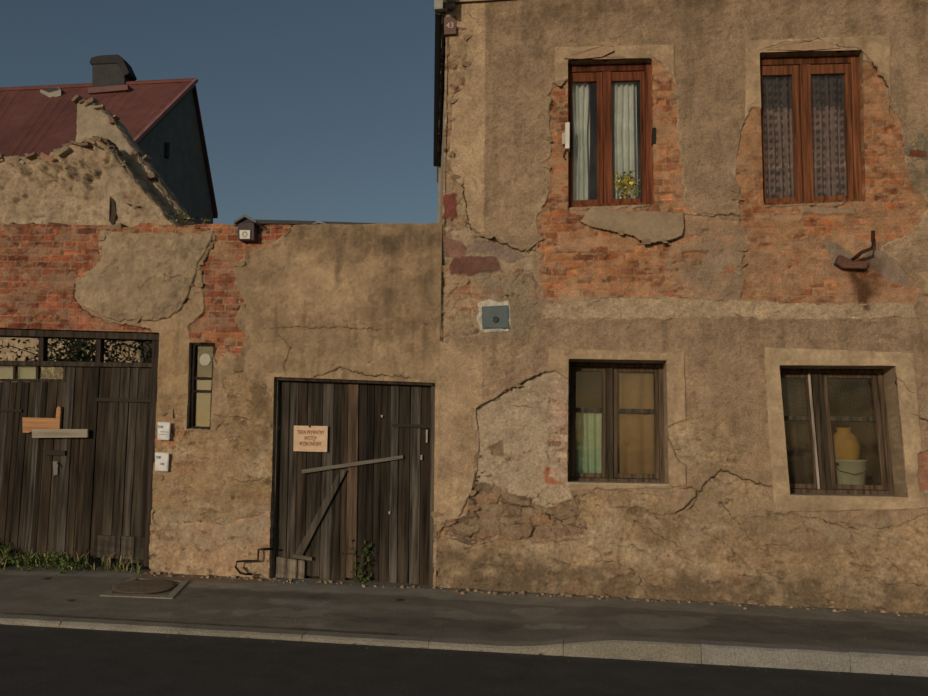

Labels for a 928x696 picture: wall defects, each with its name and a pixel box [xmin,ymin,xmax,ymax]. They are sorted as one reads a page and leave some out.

spalling [440,29,928,343]
spalling [0,94,292,530]
crack [315,367,410,379]
spalling [430,371,928,614]
crack [592,470,771,593]